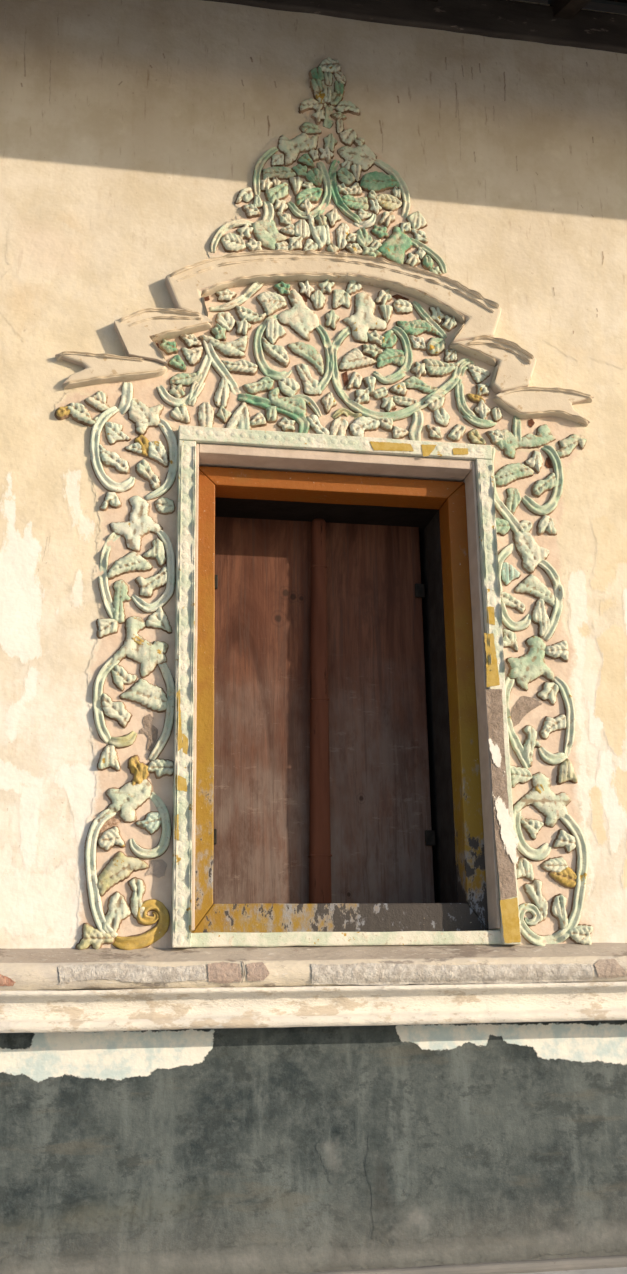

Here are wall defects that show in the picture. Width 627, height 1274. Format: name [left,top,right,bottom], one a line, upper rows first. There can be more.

peeling [0,466,122,944]
peeling [567,568,627,901]
peeling [0,1029,215,1083]
peeling [395,1022,627,1066]